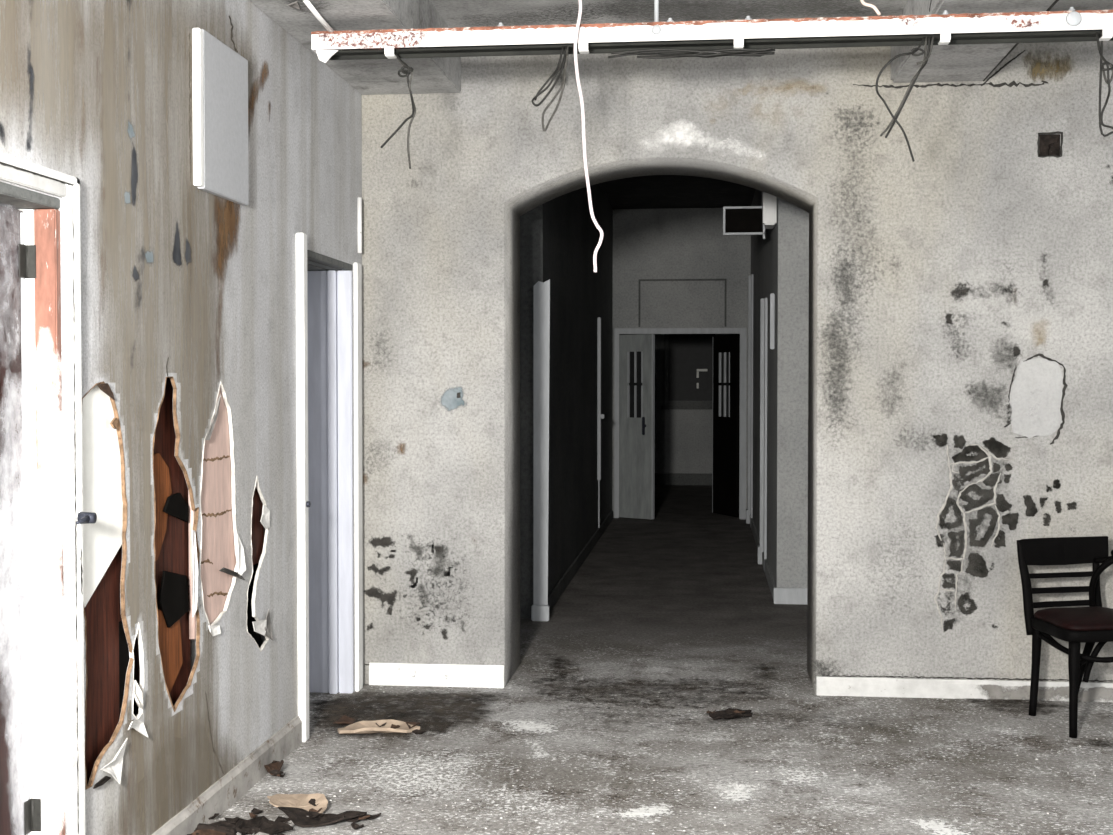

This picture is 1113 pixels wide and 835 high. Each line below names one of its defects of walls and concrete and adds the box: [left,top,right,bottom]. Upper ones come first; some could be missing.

corrosion [311,9,1113,49]
water stain [1025,55,1070,80]
water stain [829,117,874,408]
flaking render [80,381,148,790]
flaking render [152,357,273,712]
water stain [367,537,394,575]
water stain [364,545,463,639]
peeling [933,353,1077,632]